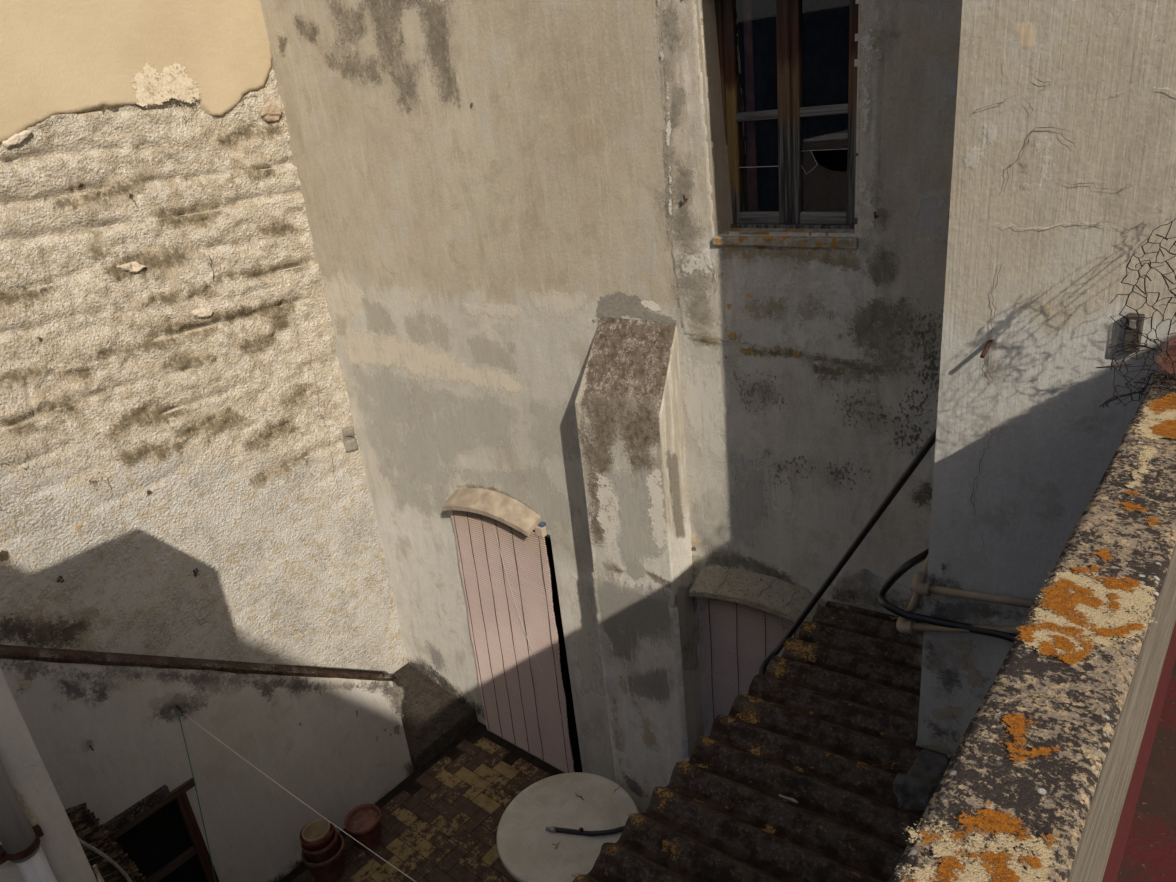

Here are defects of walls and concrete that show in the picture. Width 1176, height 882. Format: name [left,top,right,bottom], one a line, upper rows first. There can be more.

water stain [295,0,473,113]
flaking render [1,130,32,148]
flaking render [131,62,201,108]
water stain [669,84,686,128]
crack [974,59,1076,190]
crack [986,221,1141,231]
flaking render [641,300,660,312]
water stain [665,145,944,455]